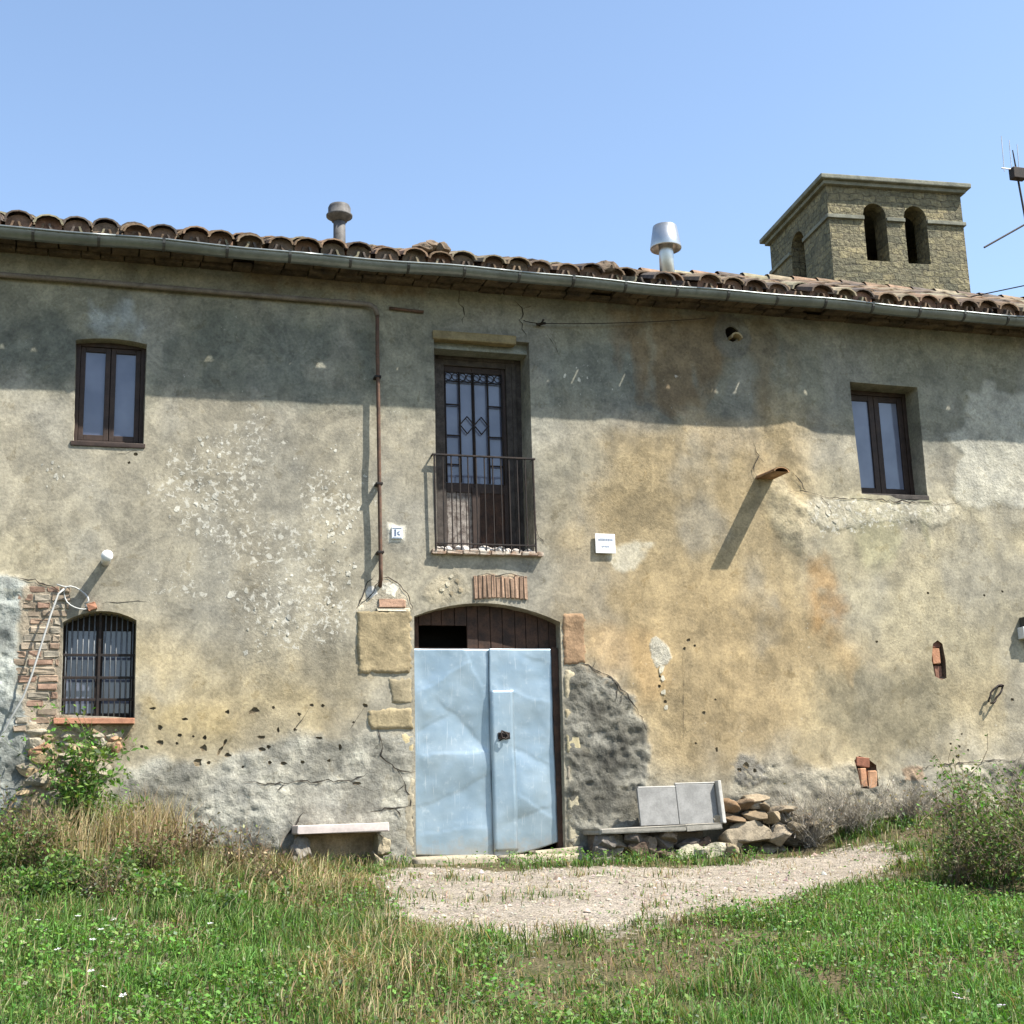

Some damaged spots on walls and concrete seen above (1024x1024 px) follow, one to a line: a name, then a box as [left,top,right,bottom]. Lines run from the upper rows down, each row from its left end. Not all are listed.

peeling [313,471,360,550]
peeling [803,377,1024,534]
spalling [0,568,416,865]
crack [254,714,414,827]
spalling [562,660,655,853]
peeling [649,636,696,710]